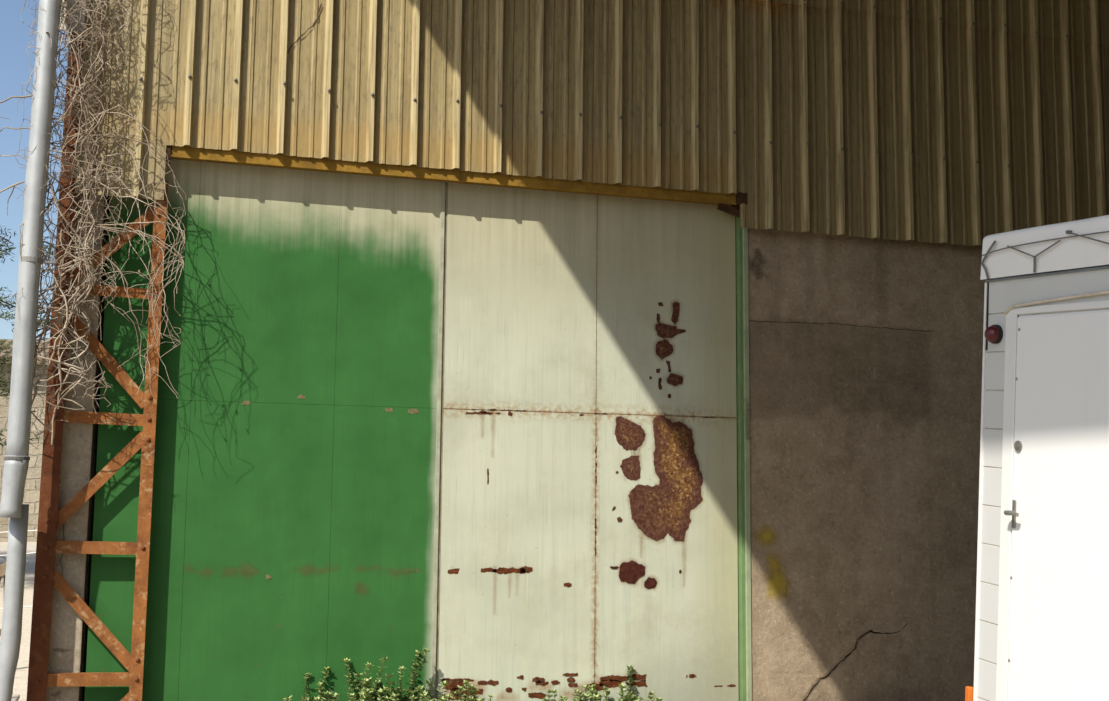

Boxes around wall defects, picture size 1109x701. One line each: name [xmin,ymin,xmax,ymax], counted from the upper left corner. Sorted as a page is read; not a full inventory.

crack [288,4,322,52]
corrosion [649,302,686,398]
corrosion [580,413,703,541]
corrosion [481,566,533,574]
corrosion [610,560,657,589]
corrosion [441,673,648,700]
crack [801,624,907,701]